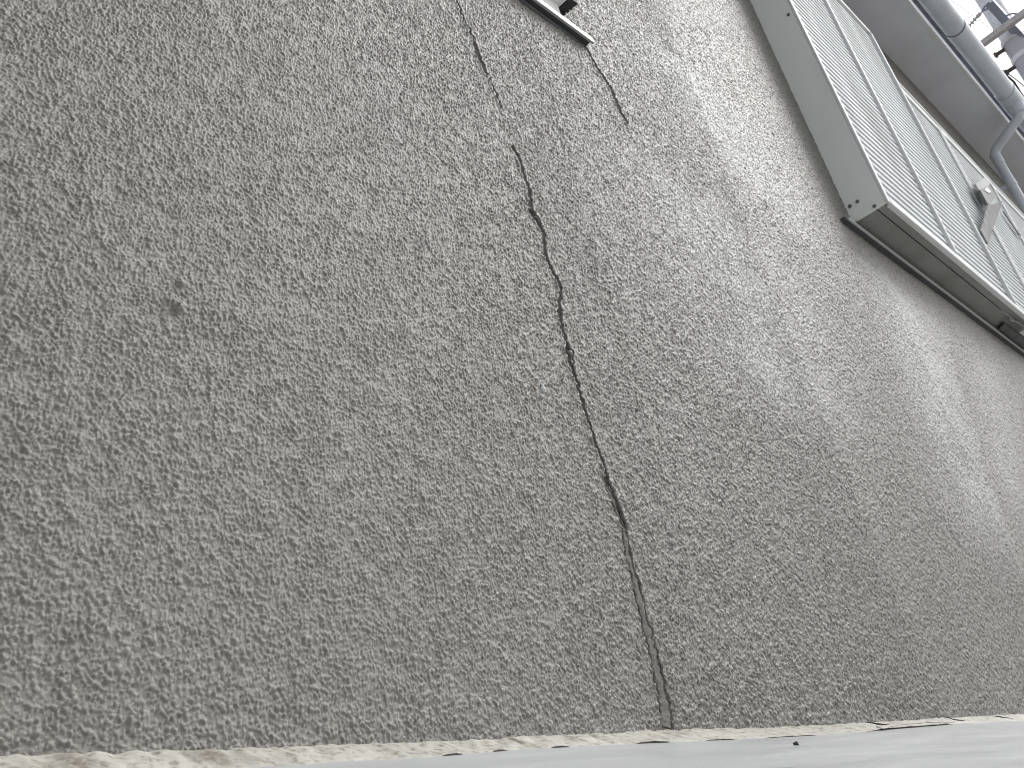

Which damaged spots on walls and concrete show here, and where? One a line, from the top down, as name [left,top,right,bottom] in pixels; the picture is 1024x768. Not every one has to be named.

crack [456,0,501,107]
crack [584,46,627,122]
crack [512,147,674,729]